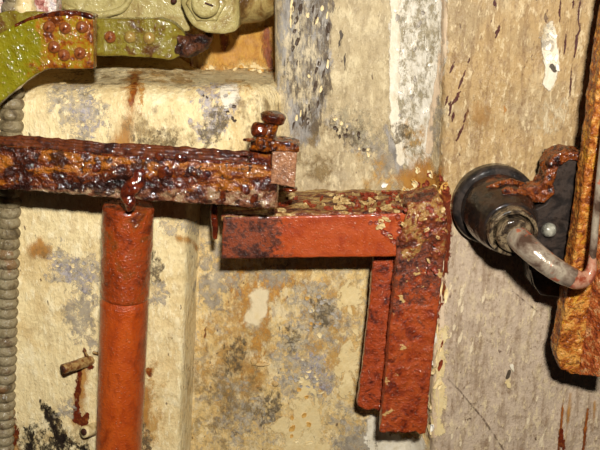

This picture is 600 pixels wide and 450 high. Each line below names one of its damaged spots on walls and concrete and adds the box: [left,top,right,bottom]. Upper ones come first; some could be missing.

spalling [540,0,567,91]
peeling [572,0,581,58]
rust [124,68,144,109]
rust [114,117,132,144]
rust [279,162,452,244]
rust [31,239,49,257]
peeling [158,219,241,315]
peeling [212,190,452,450]
leakage [16,397,90,450]
rust [72,365,94,427]
leakage [208,337,246,429]